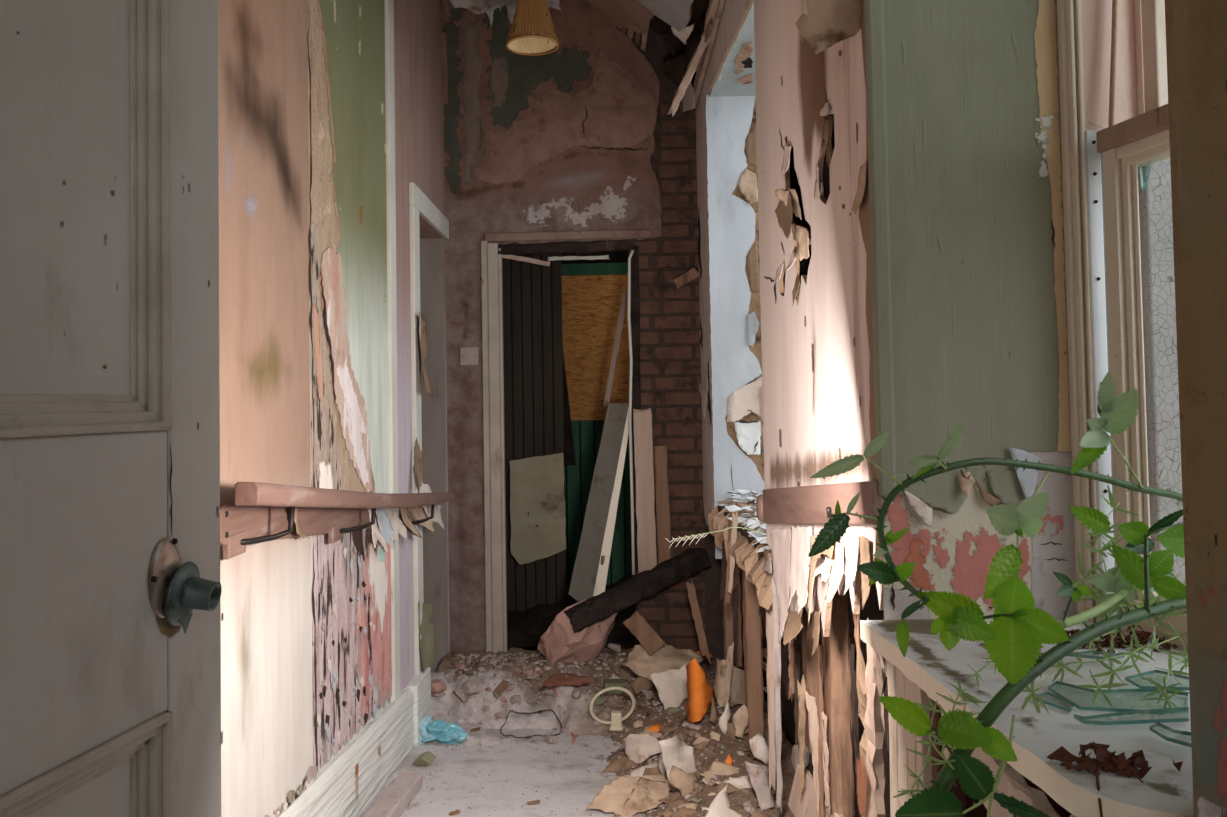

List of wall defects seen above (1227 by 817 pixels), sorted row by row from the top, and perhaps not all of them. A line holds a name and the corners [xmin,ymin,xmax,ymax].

flaking render [618,20,701,87]
peeling [1035,115,1054,177]
peeling [522,176,636,228]
flaking render [307,0,375,493]
peeling [842,0,876,481]
spalling [782,739,814,775]
peeling [1197,678,1227,817]